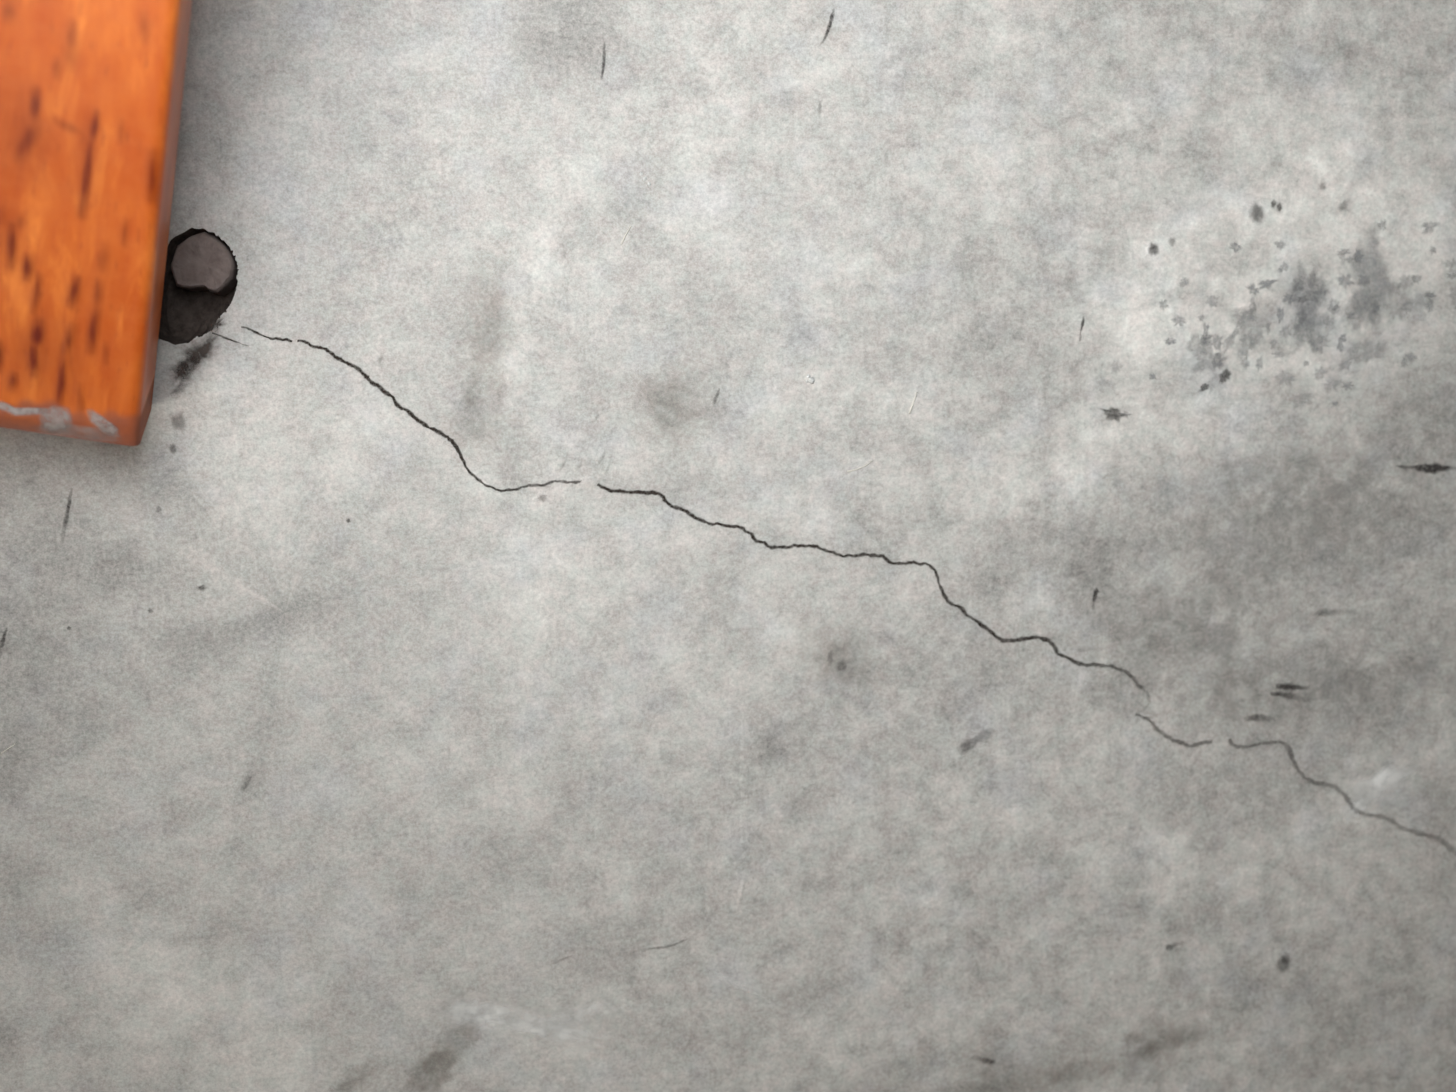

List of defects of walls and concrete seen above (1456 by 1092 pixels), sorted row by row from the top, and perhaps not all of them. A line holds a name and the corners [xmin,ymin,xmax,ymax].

crack [212,327,1149,720]